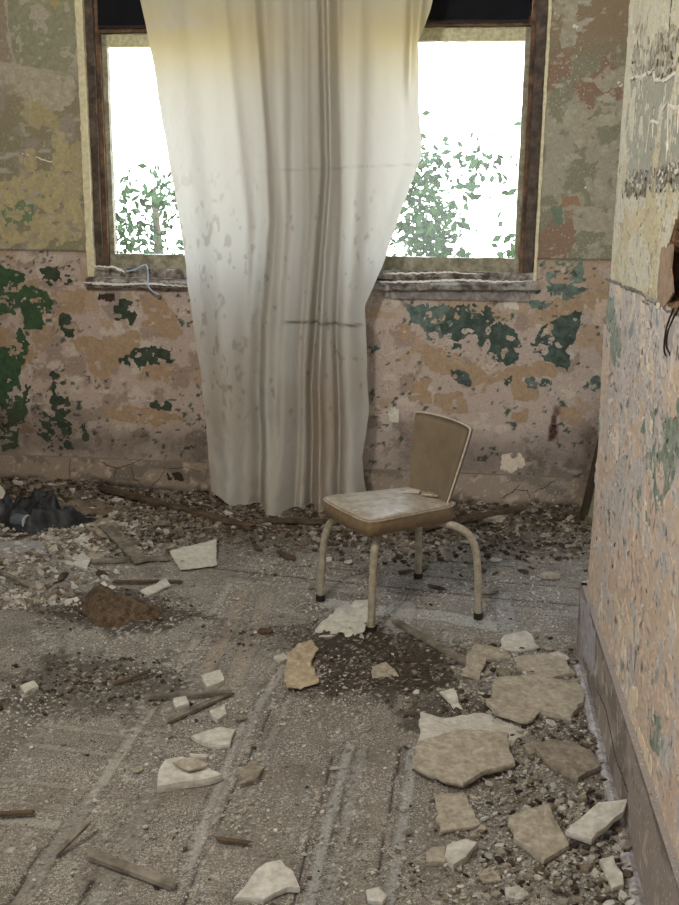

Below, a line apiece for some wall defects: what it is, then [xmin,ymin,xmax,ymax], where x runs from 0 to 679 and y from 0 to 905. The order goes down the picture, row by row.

peeling [0,0,77,112]
peeling [559,0,578,49]
peeling [561,68,679,185]
peeling [0,132,85,250]
peeling [551,177,617,233]
peeling [0,264,187,452]
peeling [380,211,679,488]
peeling [594,381,679,574]